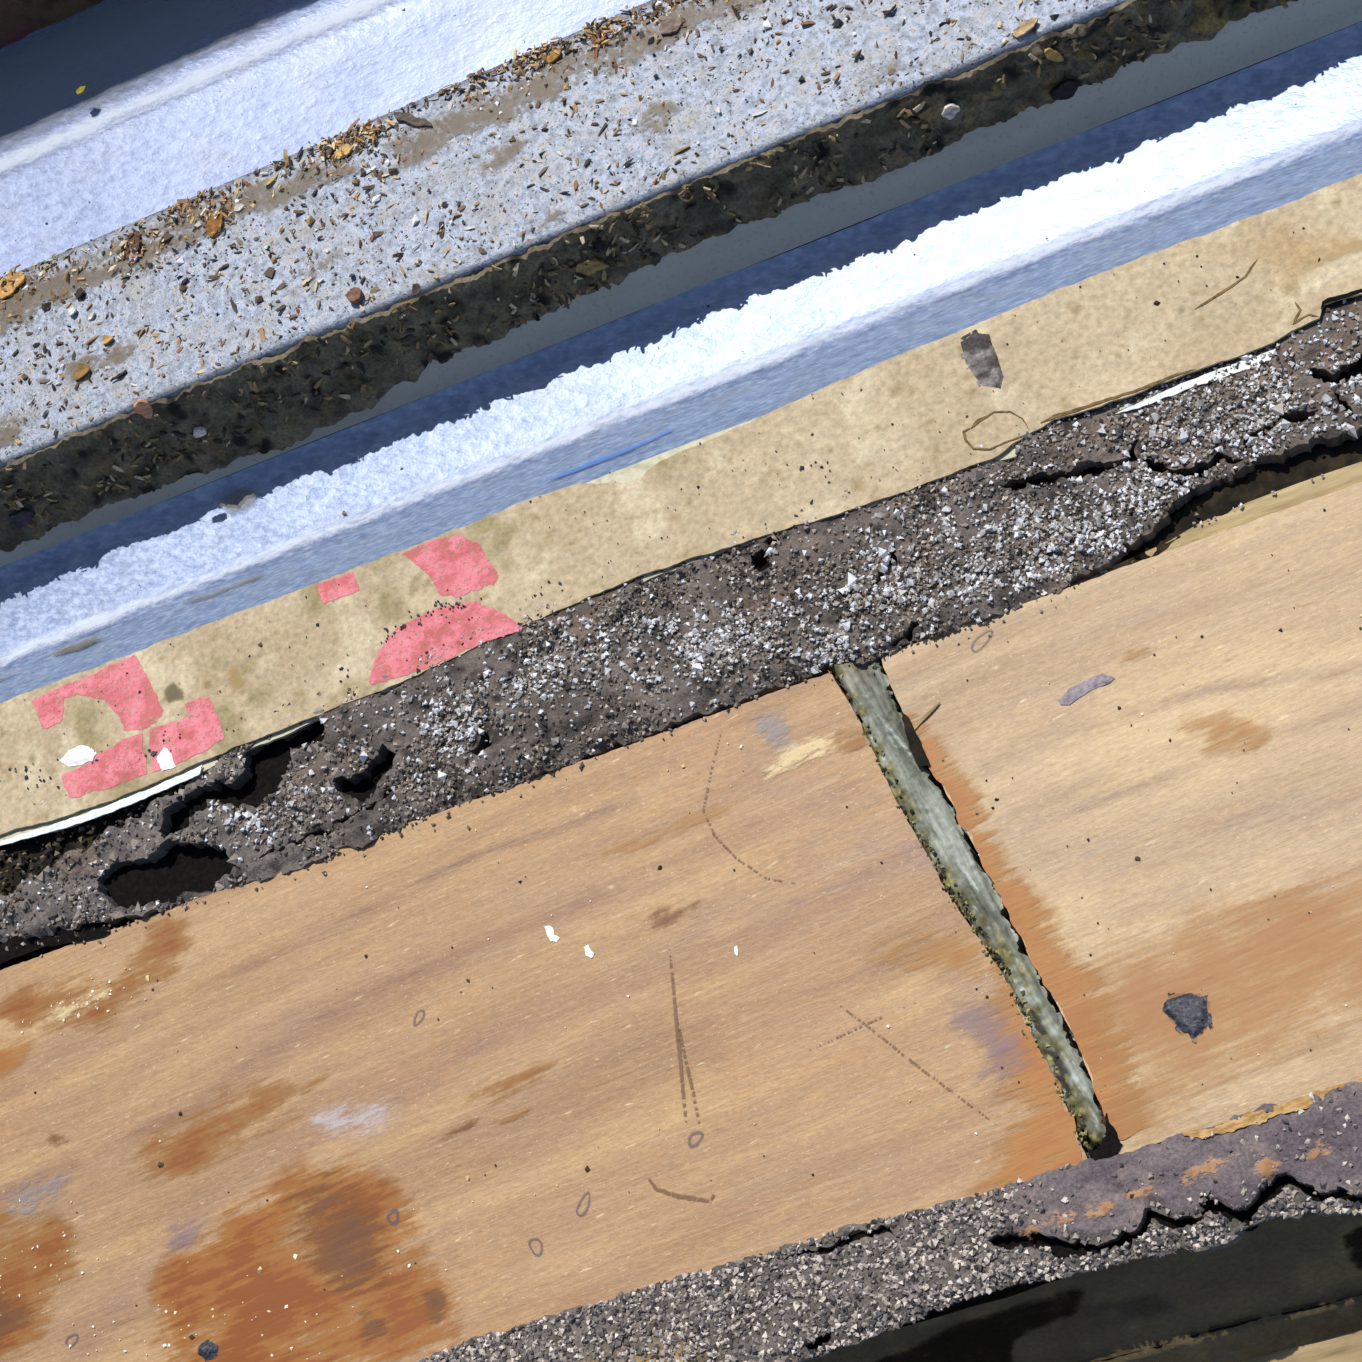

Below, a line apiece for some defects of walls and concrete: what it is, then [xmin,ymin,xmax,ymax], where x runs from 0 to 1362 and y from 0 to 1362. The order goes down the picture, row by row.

crack [1194,258,1258,310]
crack [1292,302,1319,325]
crack [1311,359,1362,416]
crack [1011,419,1307,491]
water stain [149,1165,457,1362]